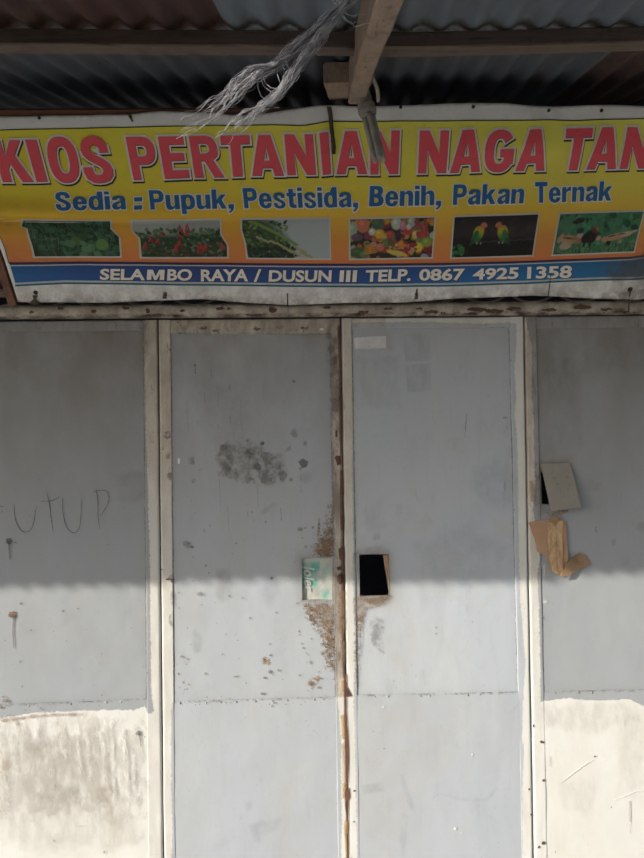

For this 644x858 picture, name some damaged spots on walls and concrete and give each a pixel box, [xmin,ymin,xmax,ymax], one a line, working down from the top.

rust [298,306,390,858]
rust [464,307,524,316]